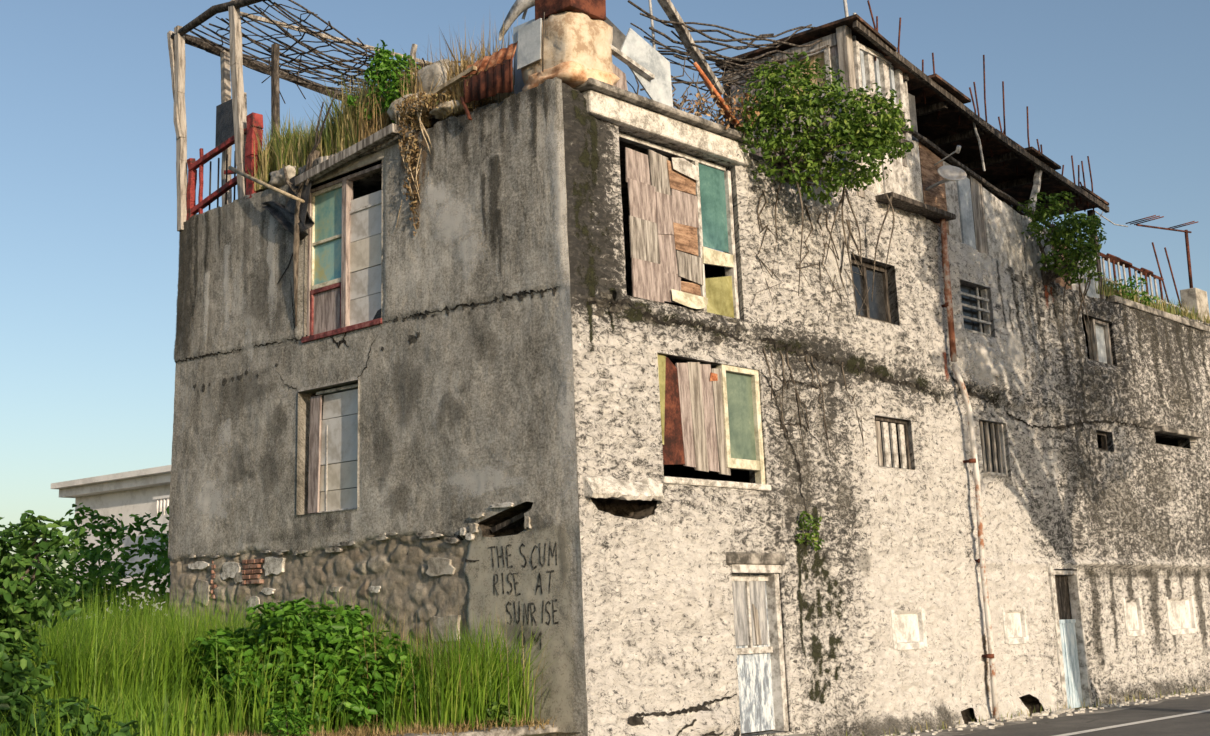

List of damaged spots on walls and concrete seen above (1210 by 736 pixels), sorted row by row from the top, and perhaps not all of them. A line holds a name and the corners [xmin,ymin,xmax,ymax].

damp [400,81,548,274]
crack [175,280,560,378]
damp [997,263,1086,404]
damp [1123,305,1210,399]
spalling [168,501,533,660]
rust [982,635,990,697]